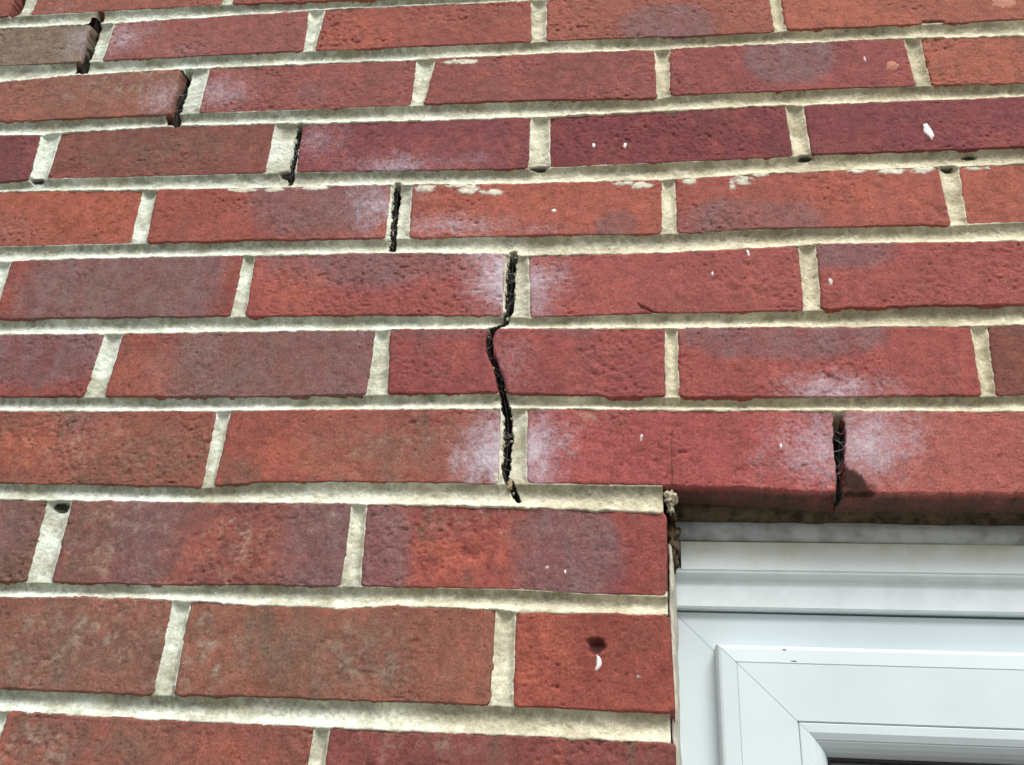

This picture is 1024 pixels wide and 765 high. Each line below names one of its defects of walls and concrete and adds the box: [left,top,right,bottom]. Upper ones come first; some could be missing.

crack [80,18,102,74]
crack [172,71,193,128]
crack [287,126,302,186]
crack [389,187,402,252]
crack [486,255,521,503]
crack [832,421,846,510]